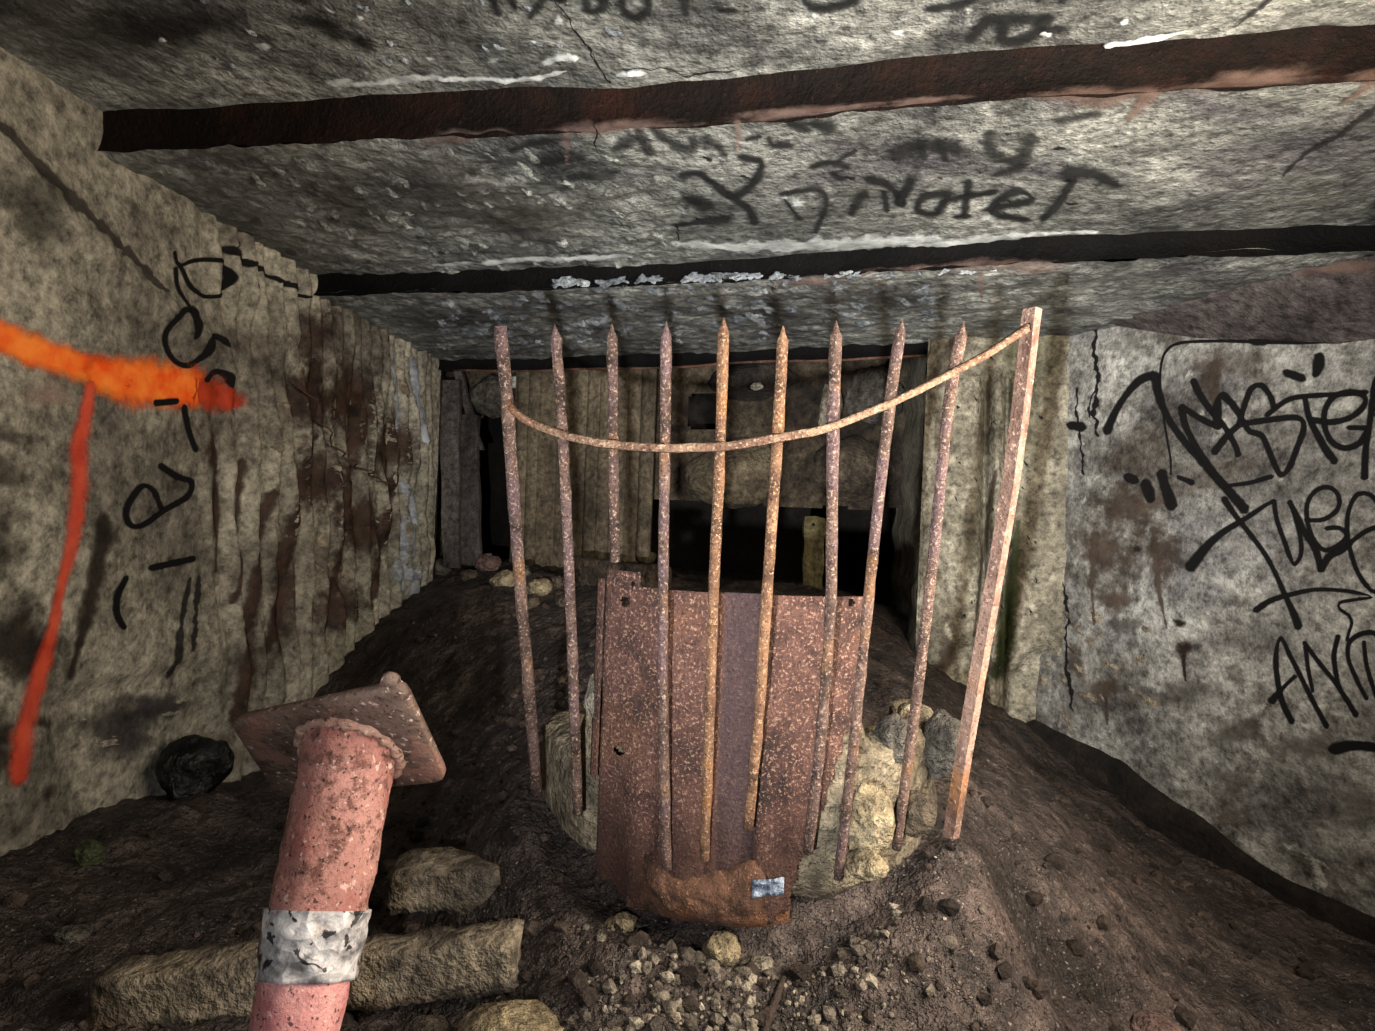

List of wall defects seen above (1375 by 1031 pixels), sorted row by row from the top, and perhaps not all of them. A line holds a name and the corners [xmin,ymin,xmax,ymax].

crack [555,3,739,83]
crack [593,120,603,153]
damp [391,352,431,445]
damp [390,480,429,597]
damp [1082,483,1186,629]
crack [1062,582,1074,711]
damp [1092,676,1114,725]